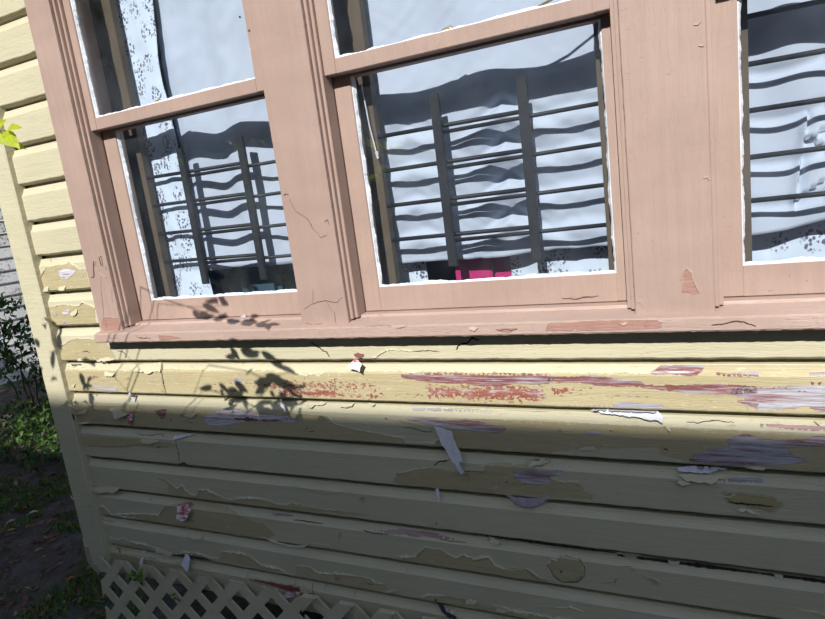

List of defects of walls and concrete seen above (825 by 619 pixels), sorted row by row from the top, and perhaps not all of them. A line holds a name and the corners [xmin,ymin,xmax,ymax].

peeling [41,259,90,292]
peeling [49,301,120,331]
peeling [546,319,665,331]
peeling [58,337,825,494]
peeling [82,500,276,540]
peeling [110,550,190,572]
spalling [486,535,825,583]
peeling [243,569,322,599]
peeling [436,602,457,619]